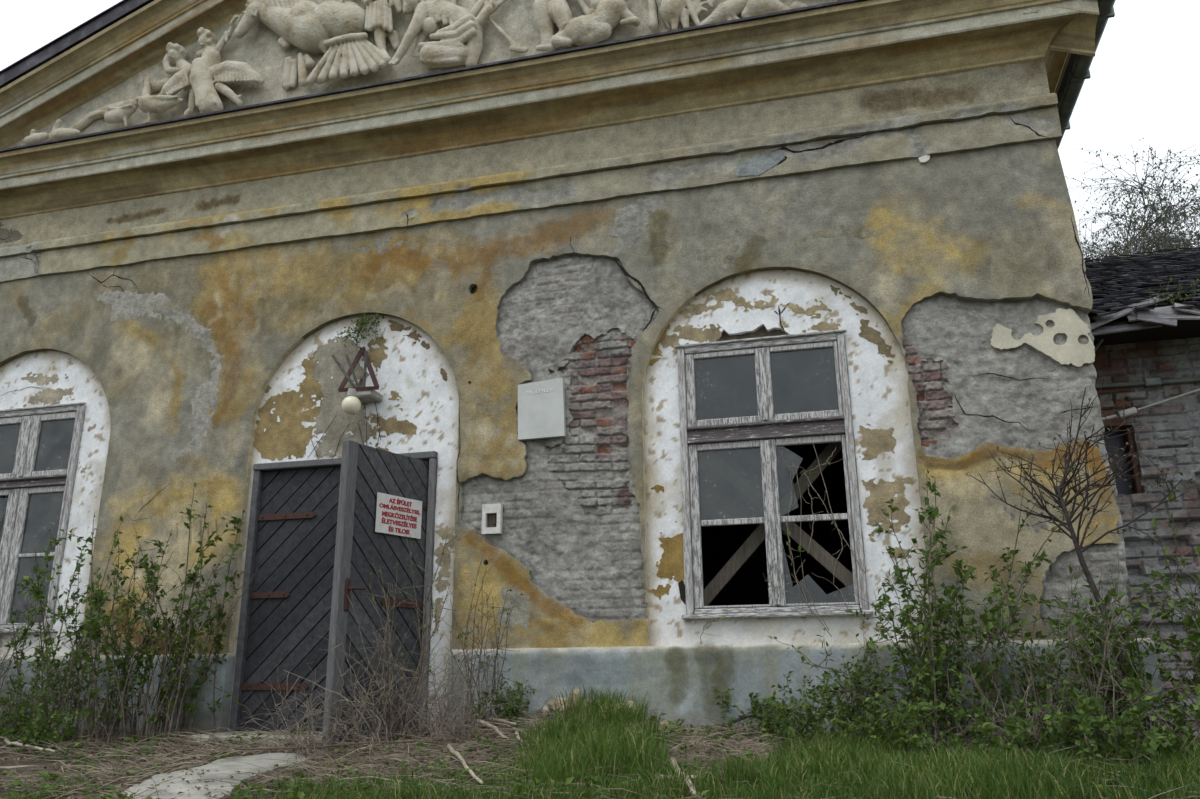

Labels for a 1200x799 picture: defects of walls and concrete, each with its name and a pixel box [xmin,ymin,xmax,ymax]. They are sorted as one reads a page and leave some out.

peeling [21,372,75,407]
peeling [253,319,430,461]
flaking render [433,194,1135,639]